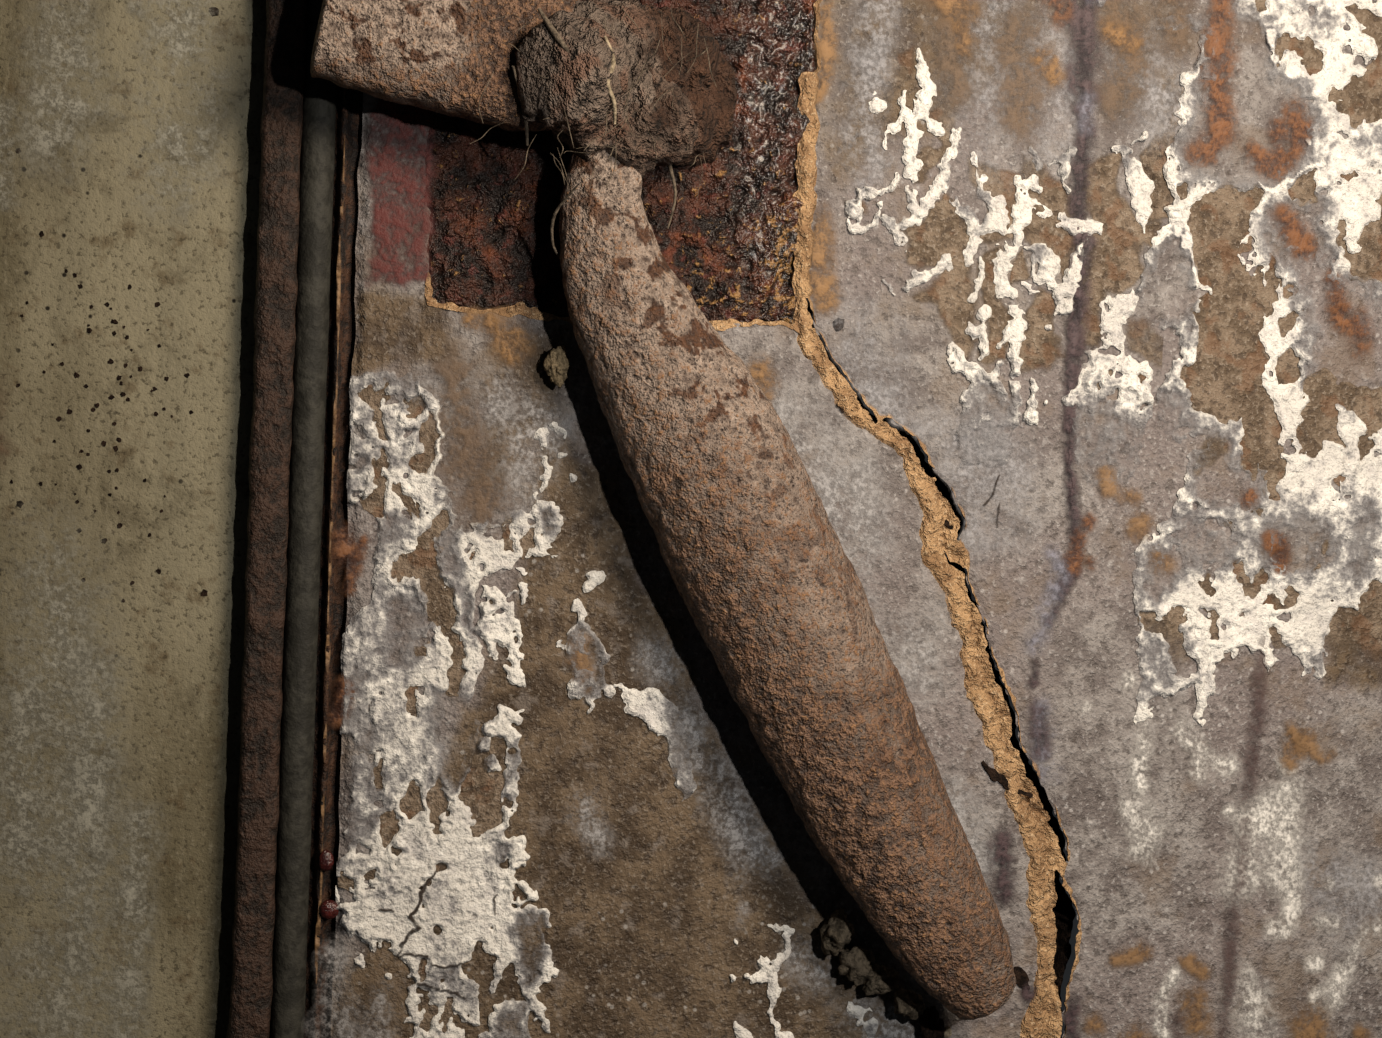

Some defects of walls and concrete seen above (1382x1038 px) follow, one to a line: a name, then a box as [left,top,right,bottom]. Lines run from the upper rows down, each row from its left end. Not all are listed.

corrosion [1188,0,1312,180]
crack [1074,232,1088,318]
peeling [845,0,1382,727]
corrosion [1277,205,1316,259]
corrosion [1326,272,1370,354]
crack [792,72,1082,1038]
peeling [335,371,567,1038]
peeling [730,923,795,1038]